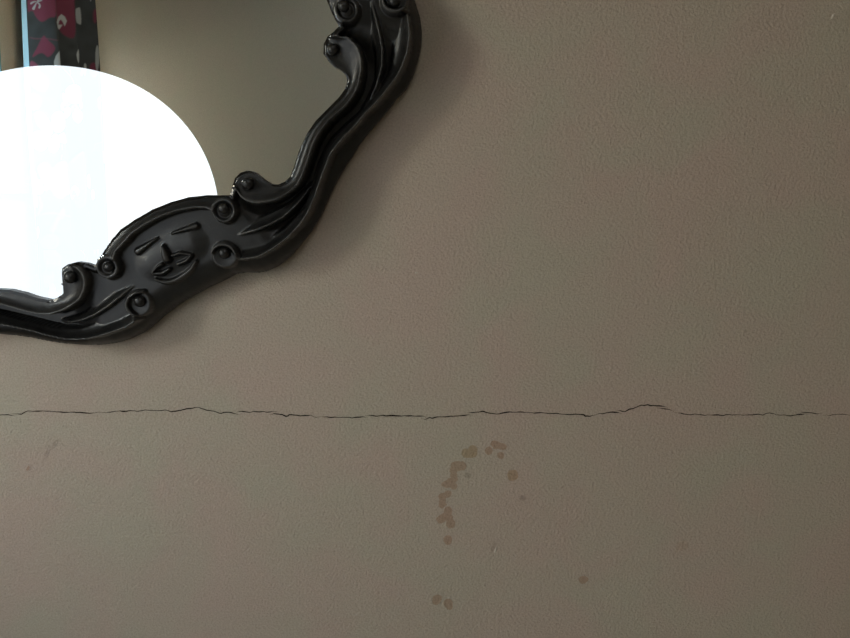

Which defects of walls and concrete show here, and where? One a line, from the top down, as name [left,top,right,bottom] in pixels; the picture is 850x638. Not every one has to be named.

crack [2,404,846,420]
damp [435,439,508,546]